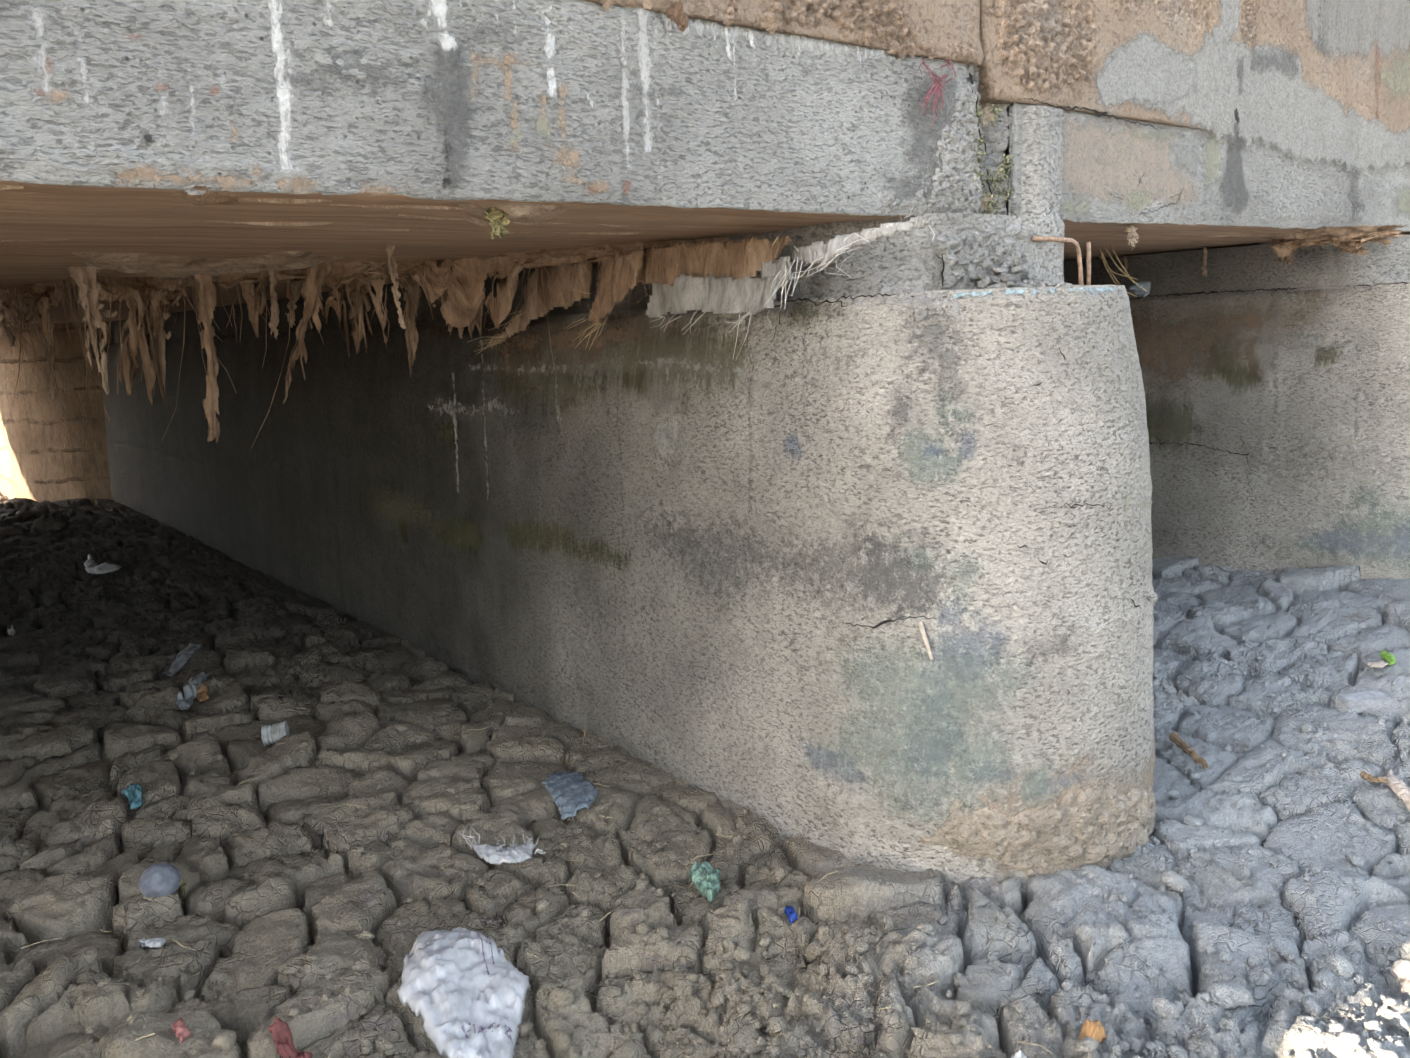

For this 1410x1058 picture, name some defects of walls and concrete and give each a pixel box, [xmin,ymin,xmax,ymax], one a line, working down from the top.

damp [267,0,293,170]
damp [422,0,469,187]
damp [542,6,556,97]
damp [1222,135,1248,211]
peeling [1097,0,1410,171]
crack [841,616,936,629]